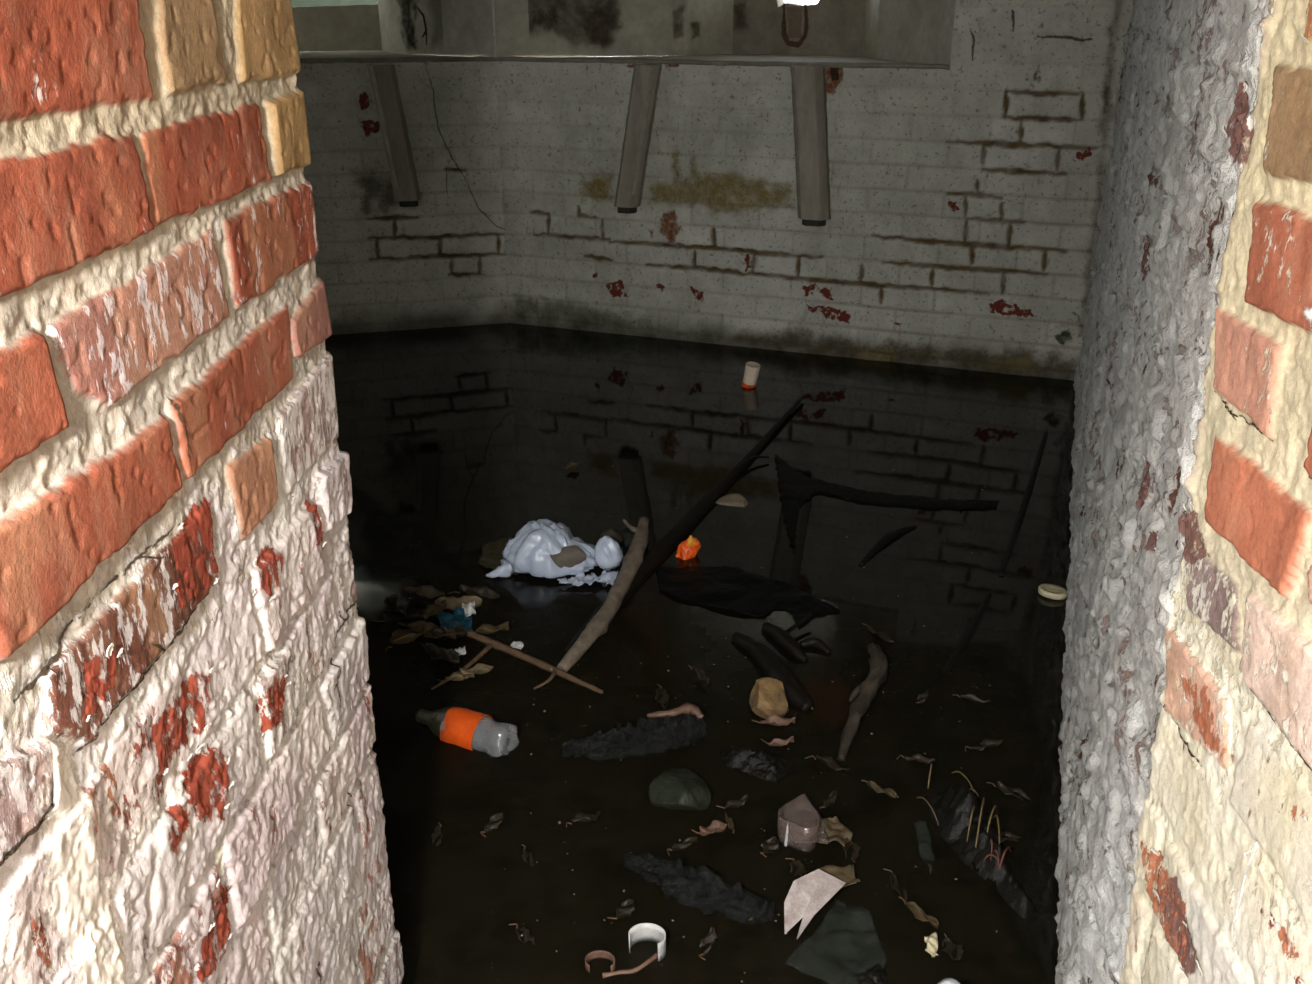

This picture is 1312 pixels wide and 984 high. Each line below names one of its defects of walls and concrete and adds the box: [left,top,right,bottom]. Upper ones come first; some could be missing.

water stain [528,0,618,45]
water stain [653,153,789,212]
water stain [737,333,1073,380]
crack [13,523,180,704]
peeling [252,545,284,603]
peeling [83,643,123,722]
crack [72,585,214,756]
peeling [144,667,235,854]
peeling [256,664,292,741]
crack [1250,689,1312,771]
crack [0,802,53,866]
peeling [194,879,232,982]